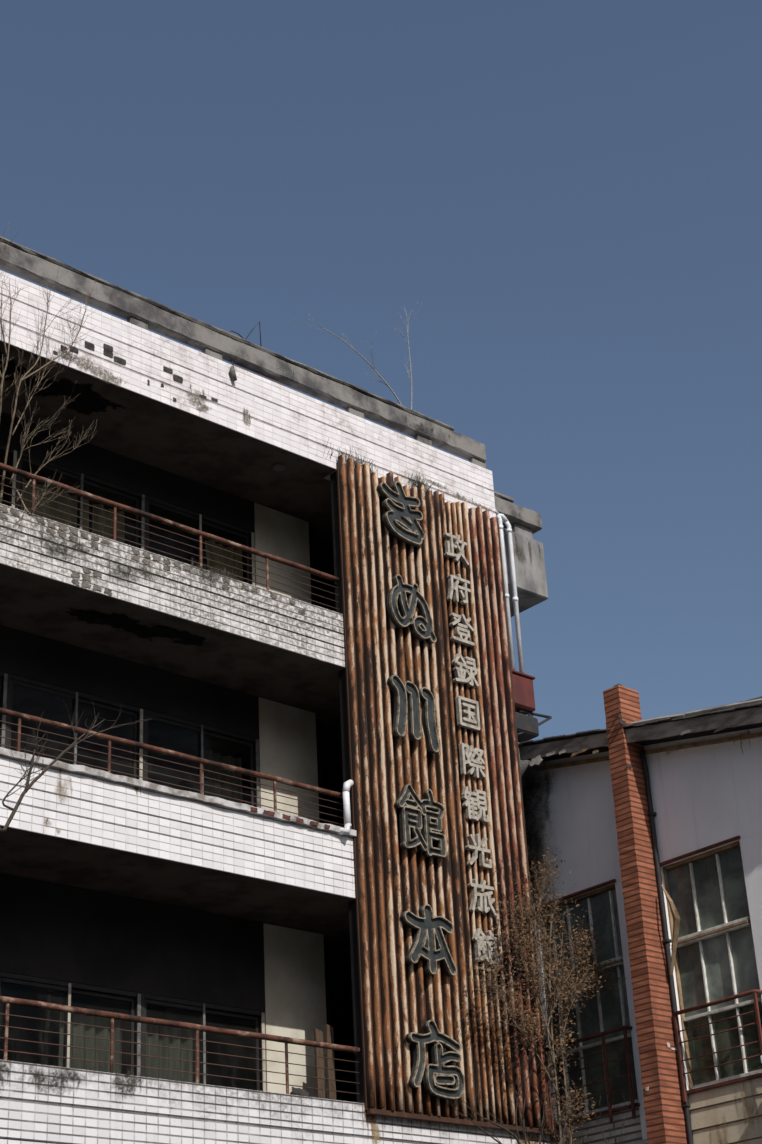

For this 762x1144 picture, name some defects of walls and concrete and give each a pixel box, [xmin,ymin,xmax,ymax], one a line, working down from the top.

peeling [53,341,126,365]
peeling [0,351,125,415]
peeling [147,366,183,387]
mould [41,531,89,558]
damp [108,558,151,580]
mould [522,771,549,921]
mould [34,1070,80,1089]
damp [114,1071,141,1095]